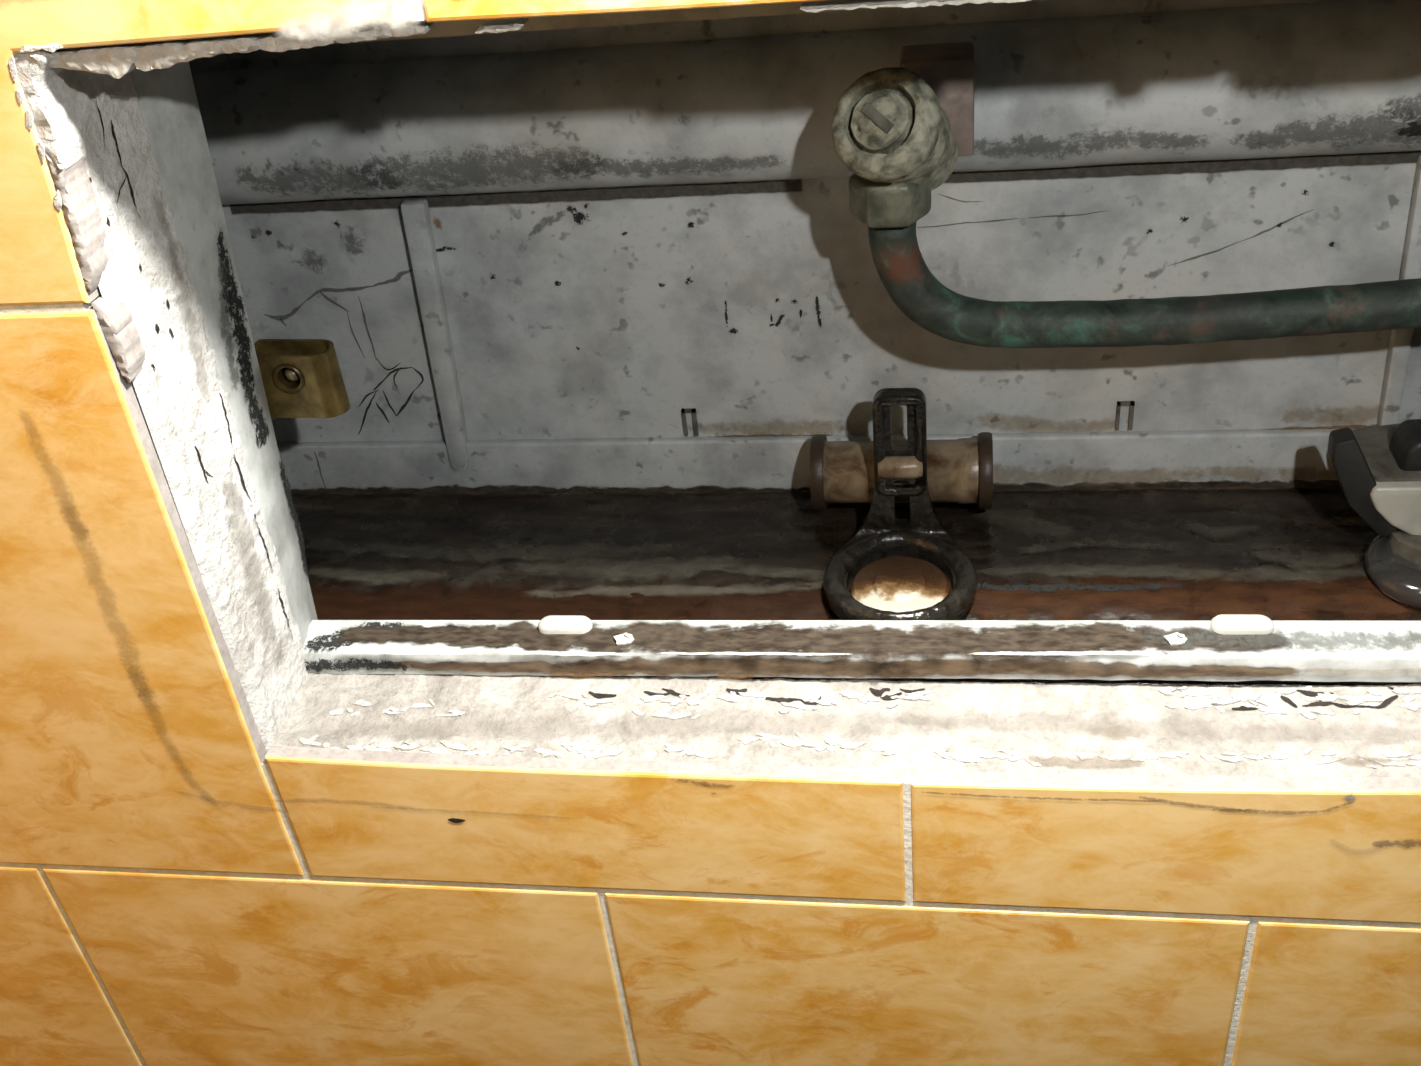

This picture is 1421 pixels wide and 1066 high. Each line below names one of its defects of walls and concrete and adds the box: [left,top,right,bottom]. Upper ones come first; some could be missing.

damp [944,96,1421,183]
damp [229,152,802,254]
damp [216,227,269,448]
damp [770,296,822,328]
damp [279,461,810,581]
crack [1232,687,1410,710]